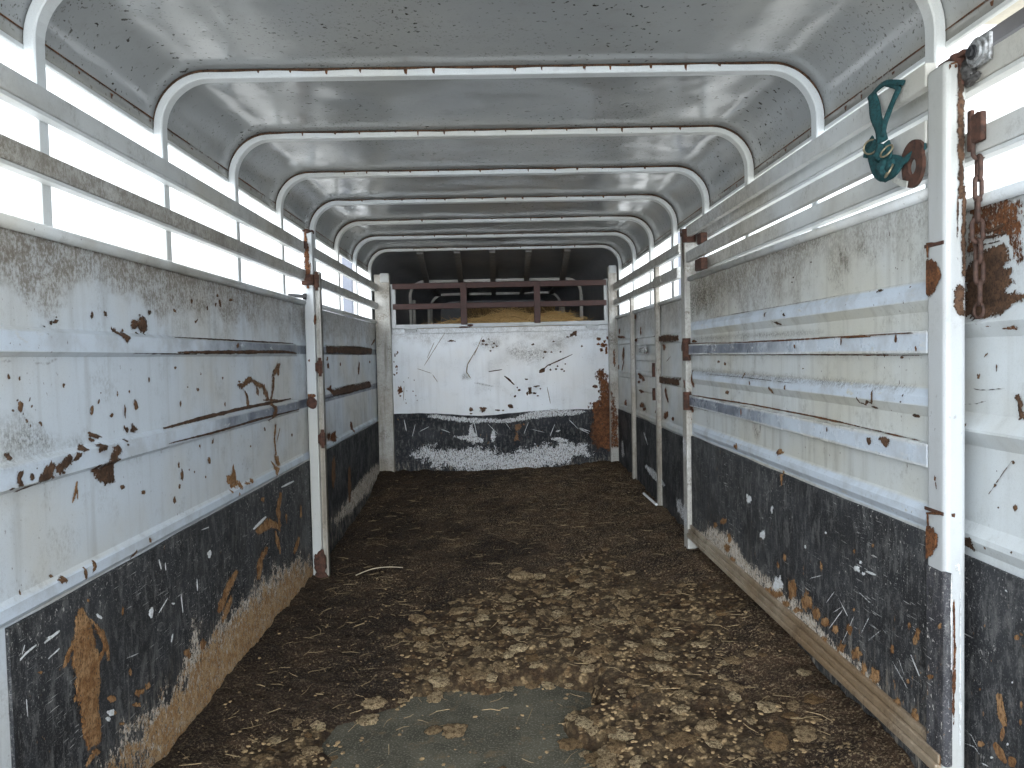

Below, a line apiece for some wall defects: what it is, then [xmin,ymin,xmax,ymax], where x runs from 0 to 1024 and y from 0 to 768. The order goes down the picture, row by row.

corrosion [945,0,994,31]
corrosion [167,125,811,289]
corrosion [949,61,1024,316]
corrosion [163,398,299,444]
corrosion [588,315,919,451]
corrosion [926,512,955,560]